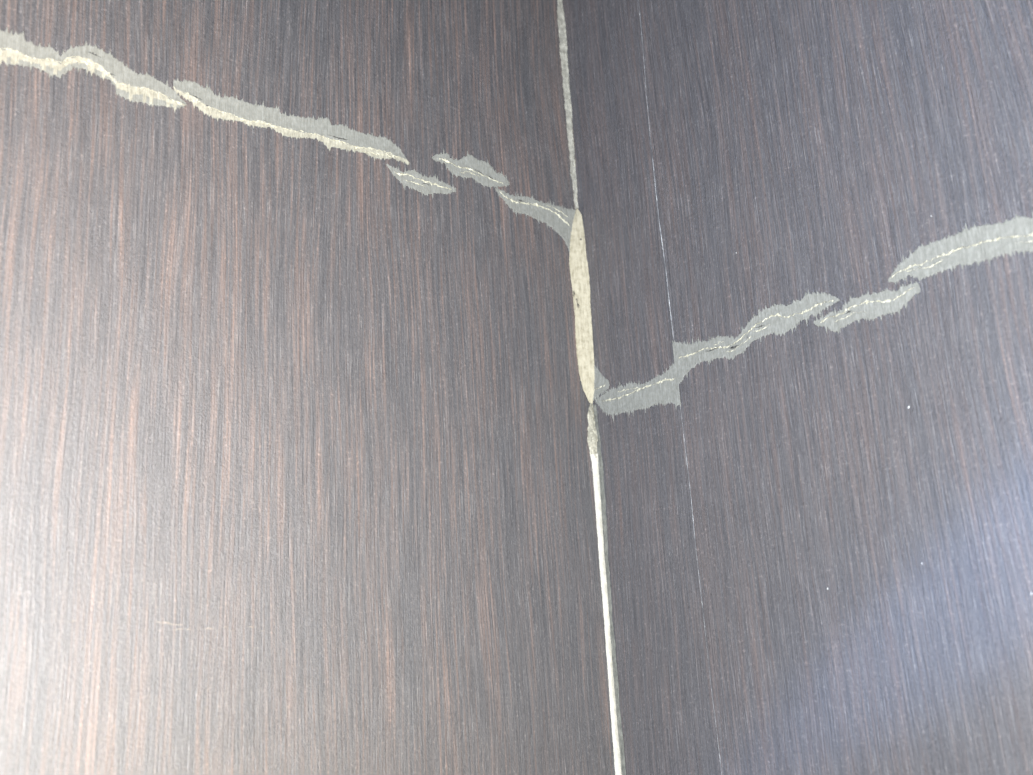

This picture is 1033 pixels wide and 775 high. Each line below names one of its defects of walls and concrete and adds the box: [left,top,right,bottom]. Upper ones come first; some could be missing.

crack [0,26,576,252]